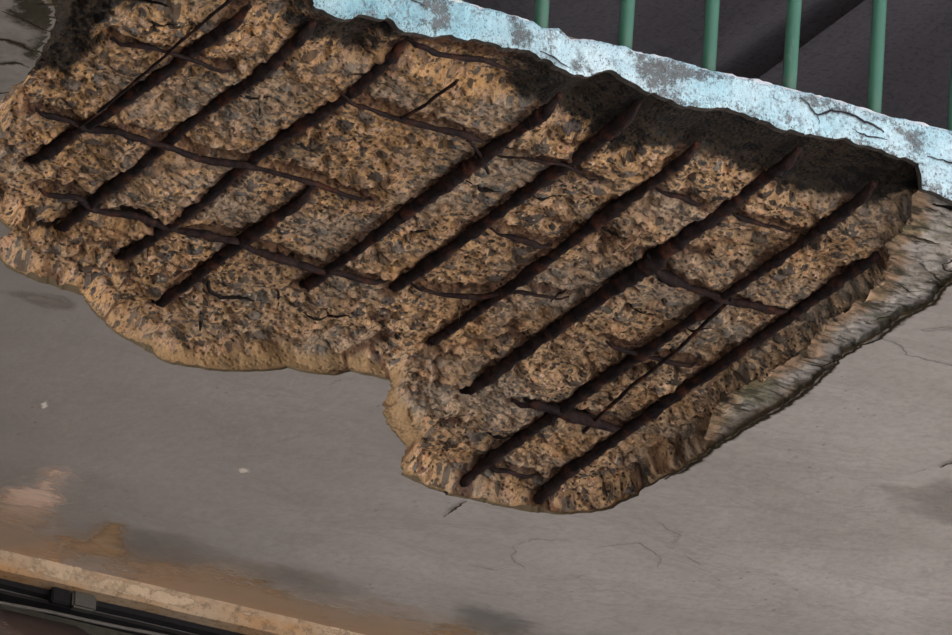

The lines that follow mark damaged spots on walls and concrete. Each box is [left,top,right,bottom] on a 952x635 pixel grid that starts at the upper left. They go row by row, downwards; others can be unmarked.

crack [131,0,169,8]
crack [0,3,74,68]
crack [800,97,887,140]
crack [931,203,952,212]
spalling [0,0,924,514]
crack [665,235,952,480]
corrosion [12,536,83,562]